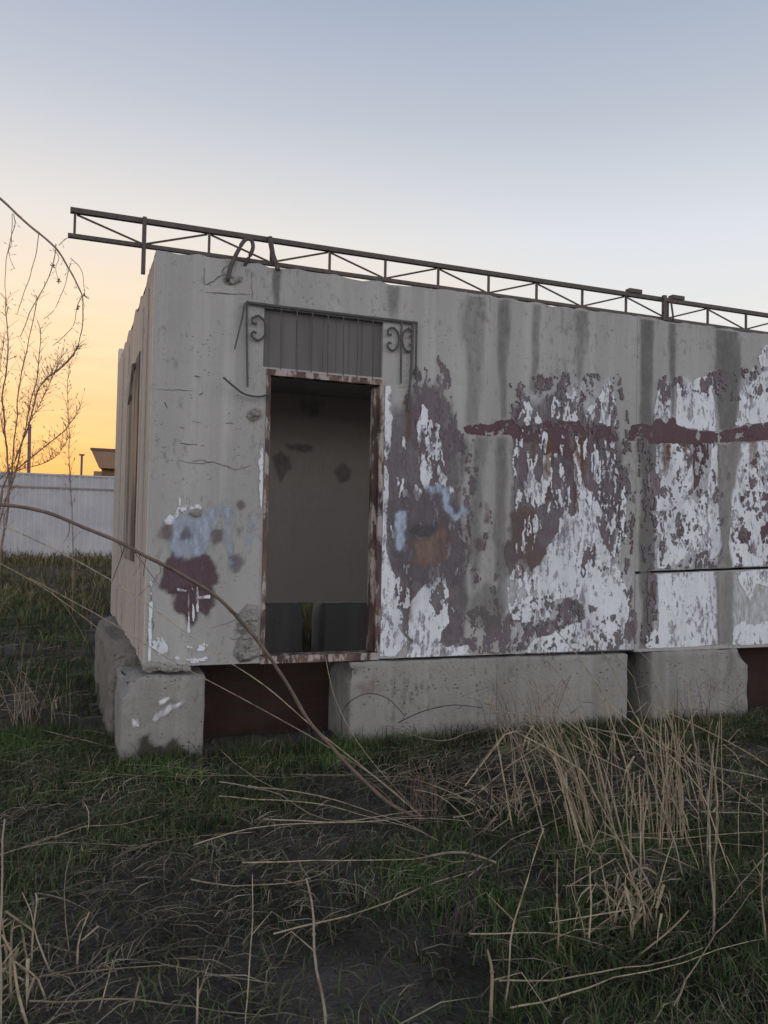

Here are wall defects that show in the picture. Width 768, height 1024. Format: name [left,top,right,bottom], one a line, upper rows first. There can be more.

crack [162,376,252,470]
peeling [164,498,203,525]
peeling [380,345,768,657]
damp [505,319,768,653]
peeling [148,582,210,663]
spalling [233,603,260,663]